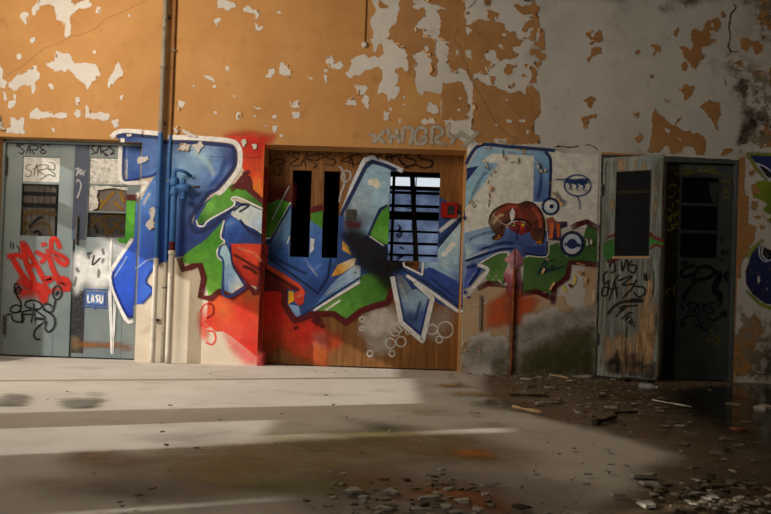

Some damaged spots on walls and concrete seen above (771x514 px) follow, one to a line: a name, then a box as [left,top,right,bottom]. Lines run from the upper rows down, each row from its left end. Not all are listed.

peeling [20,0,101,38]
peeling [0,50,123,134]
peeling [265,62,291,78]
peeling [289,101,300,119]
crack [454,30,563,207]
crack [725,3,739,84]
damp [733,65,771,149]
peeling [145,207,155,230]
peeling [323,0,771,384]
crack [577,237,592,283]